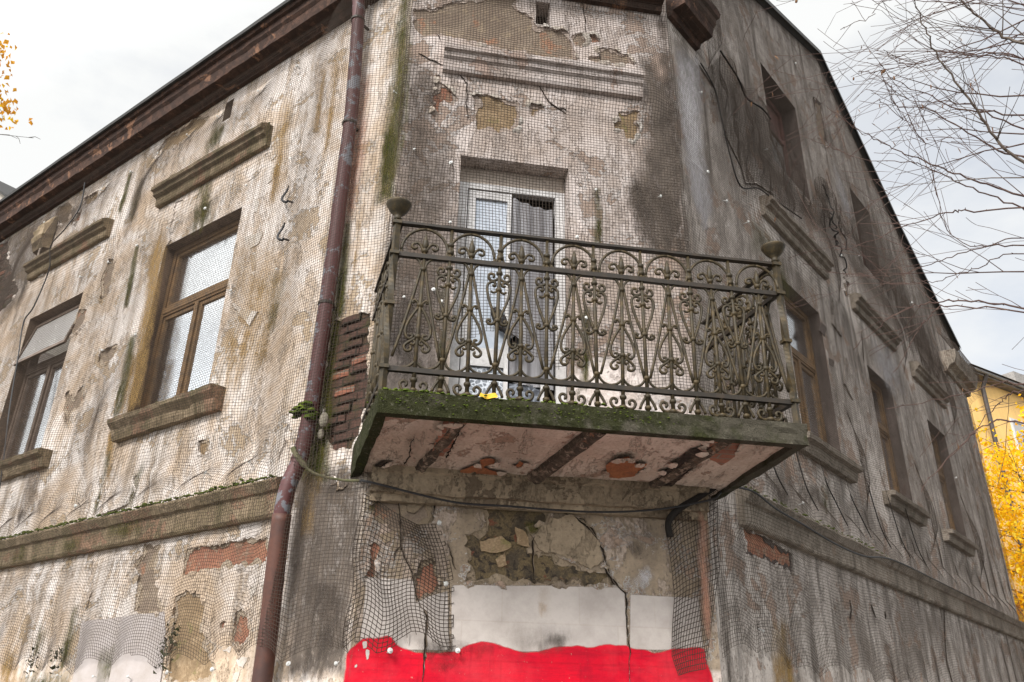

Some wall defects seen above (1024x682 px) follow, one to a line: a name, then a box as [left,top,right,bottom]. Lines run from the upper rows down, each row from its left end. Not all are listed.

spalling [413,0,636,67]
spalling [427,76,545,133]
spalling [612,111,644,144]
water stain [387,72,448,388]
flaking render [322,313,374,451]
spalling [427,421,463,456]
spalling [460,458,530,476]
spalling [603,440,745,487]
spalling [462,509,614,590]
spalling [742,529,794,576]
spalling [131,534,268,682]
crack [532,513,631,682]